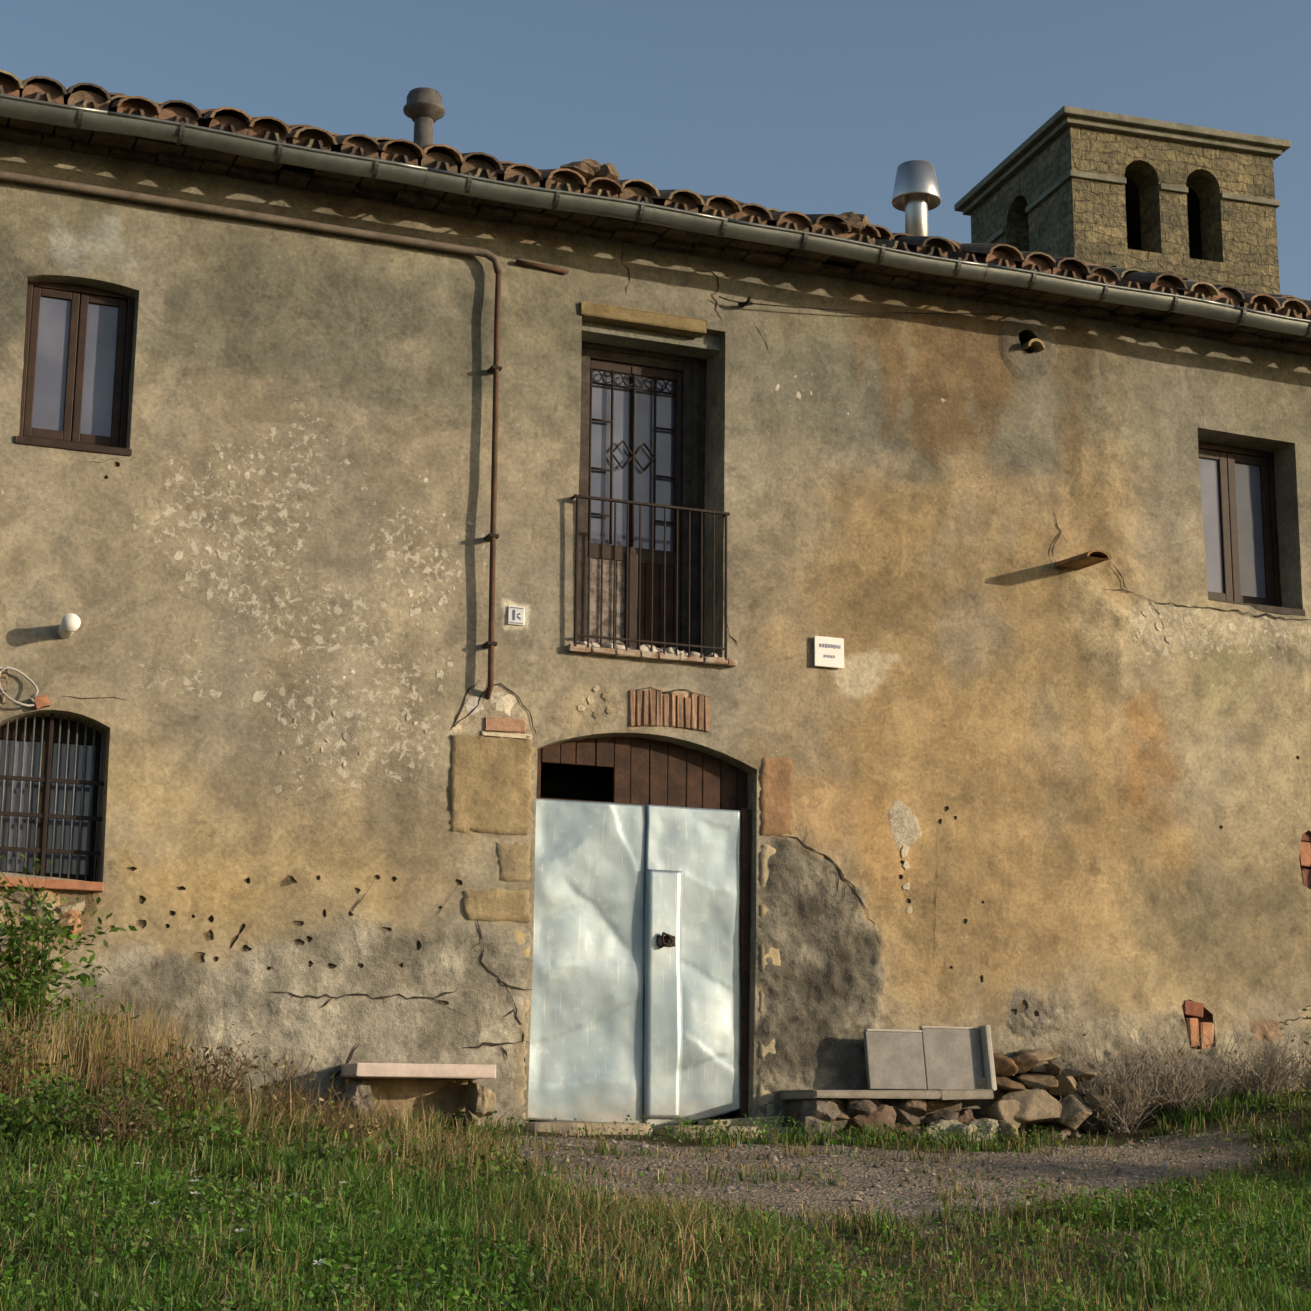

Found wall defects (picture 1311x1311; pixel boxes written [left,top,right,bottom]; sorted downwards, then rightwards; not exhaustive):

peeling [252,686,296,723]
peeling [389,513,461,635]
peeling [423,652,453,692]
crack [1052,512,1069,570]
peeling [1123,597,1311,664]
peeling [888,799,922,914]
spalling [0,872,534,1132]
crack [275,919,532,1073]
spalling [753,828,890,1127]